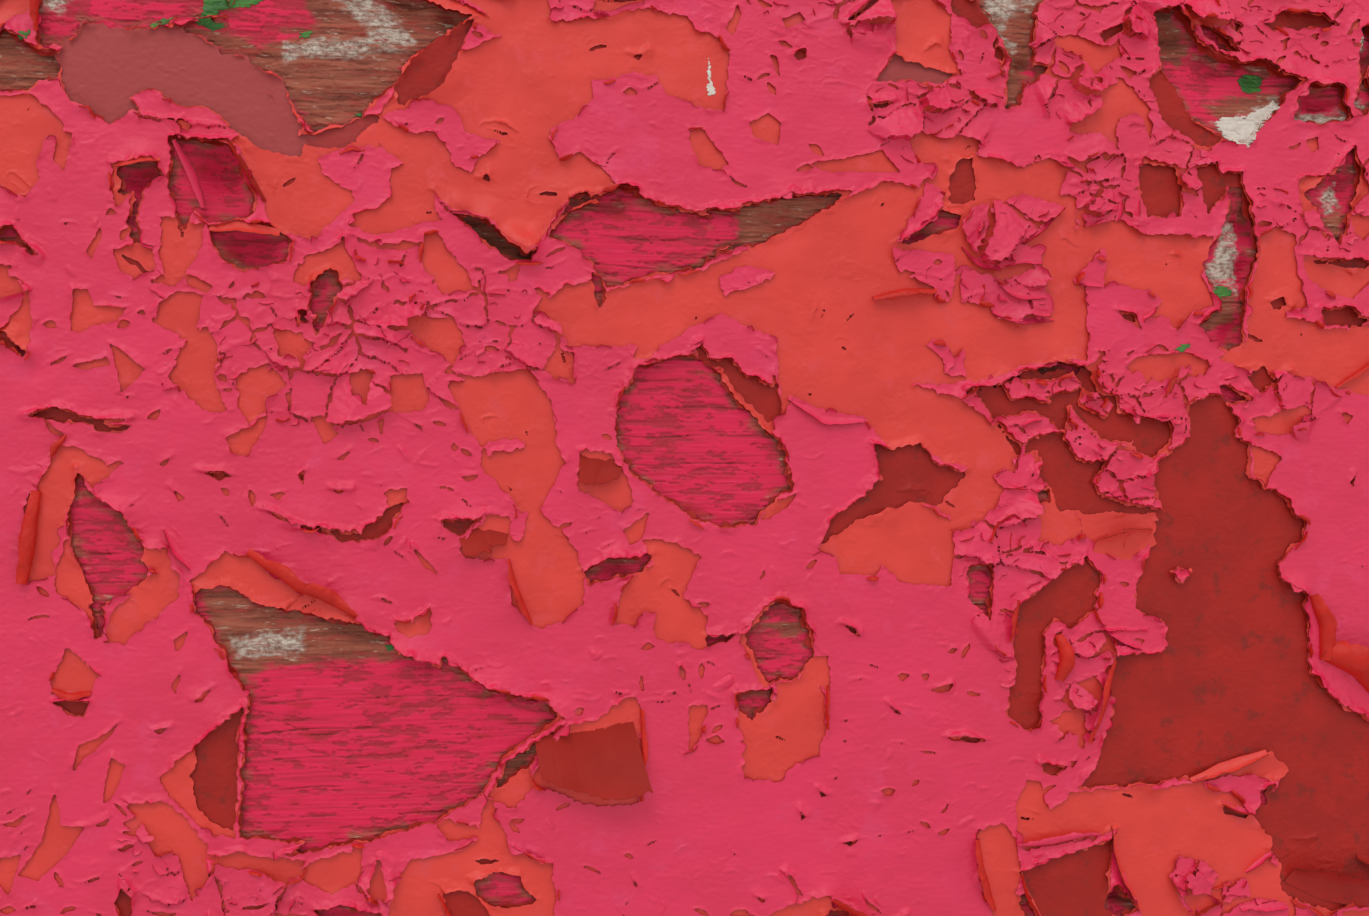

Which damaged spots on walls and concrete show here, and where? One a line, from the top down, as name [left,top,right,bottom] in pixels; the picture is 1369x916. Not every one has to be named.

peeling [0,406,653,916]
peeling [0,0,843,796]
peeling [532,0,1288,916]
peeling [944,0,1369,916]